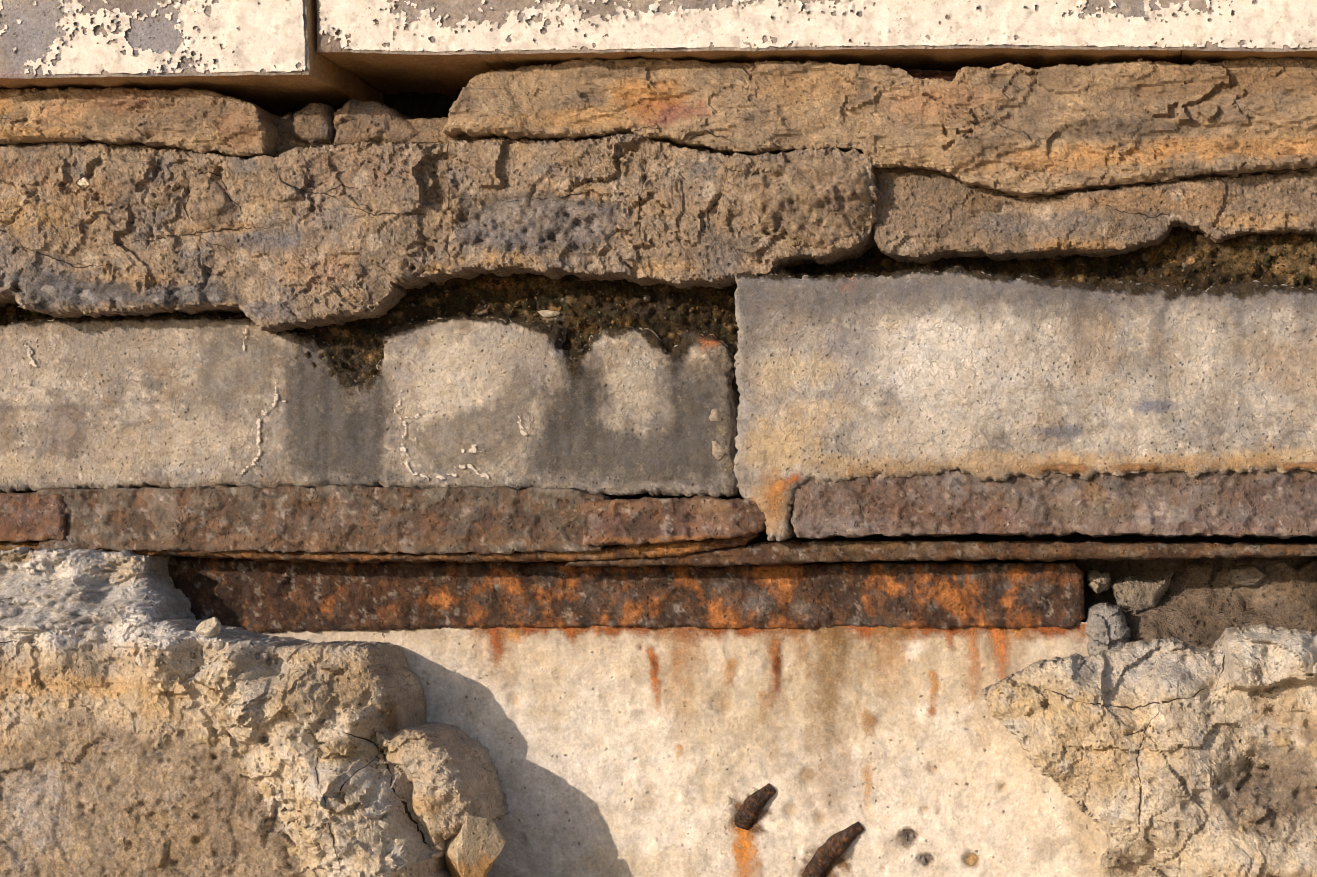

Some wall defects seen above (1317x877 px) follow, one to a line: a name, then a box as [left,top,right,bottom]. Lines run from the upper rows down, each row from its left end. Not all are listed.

peeling [0,0,1317,75]
damp [202,325,721,485]
rust [0,541,39,551]
rust [96,533,763,564]
rust [486,624,1086,715]
rust [862,711,876,727]
crack [1046,655,1225,836]
spalling [982,623,1317,877]
crack [315,732,430,876]
rust [733,823,760,877]